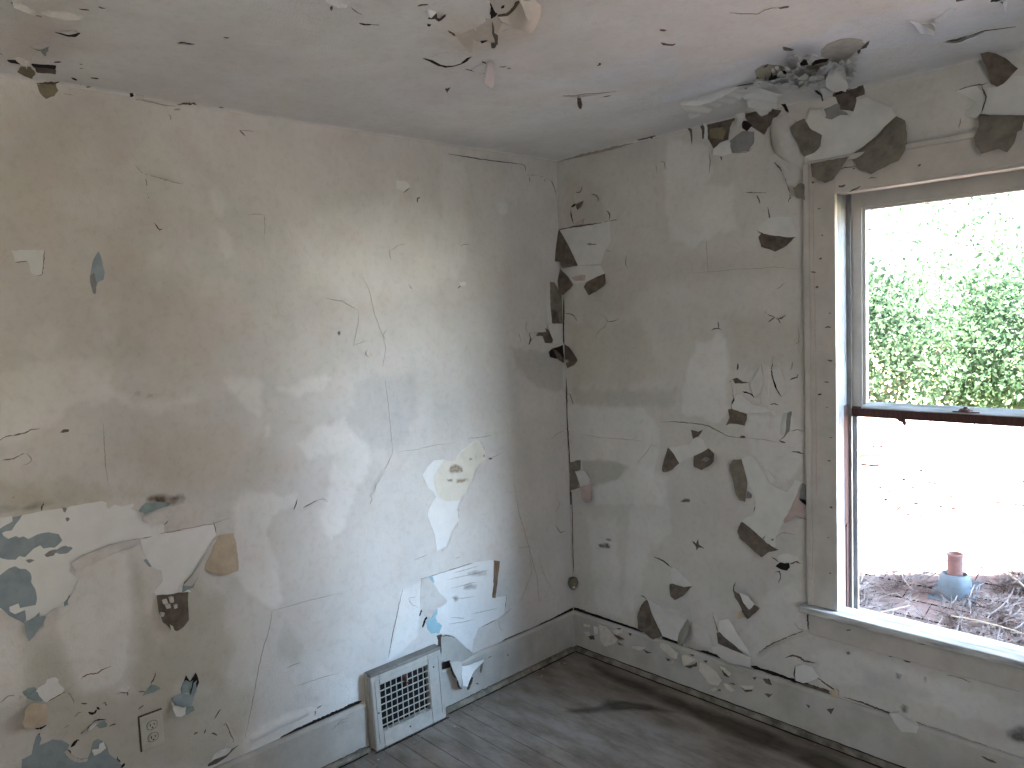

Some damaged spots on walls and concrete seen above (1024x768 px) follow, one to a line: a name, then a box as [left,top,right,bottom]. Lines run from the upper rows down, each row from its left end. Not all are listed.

peeling [682,38,907,200]
peeling [956,52,1024,154]
peeling [555,219,616,295]
crack [326,277,499,503]
peeling [518,322,577,368]
peeling [662,430,714,472]
peeling [0,666,125,768]
peeling [0,501,239,641]
crack [215,593,337,740]
peeling [419,560,512,690]
peeling [583,557,772,698]
peeling [730,455,812,581]